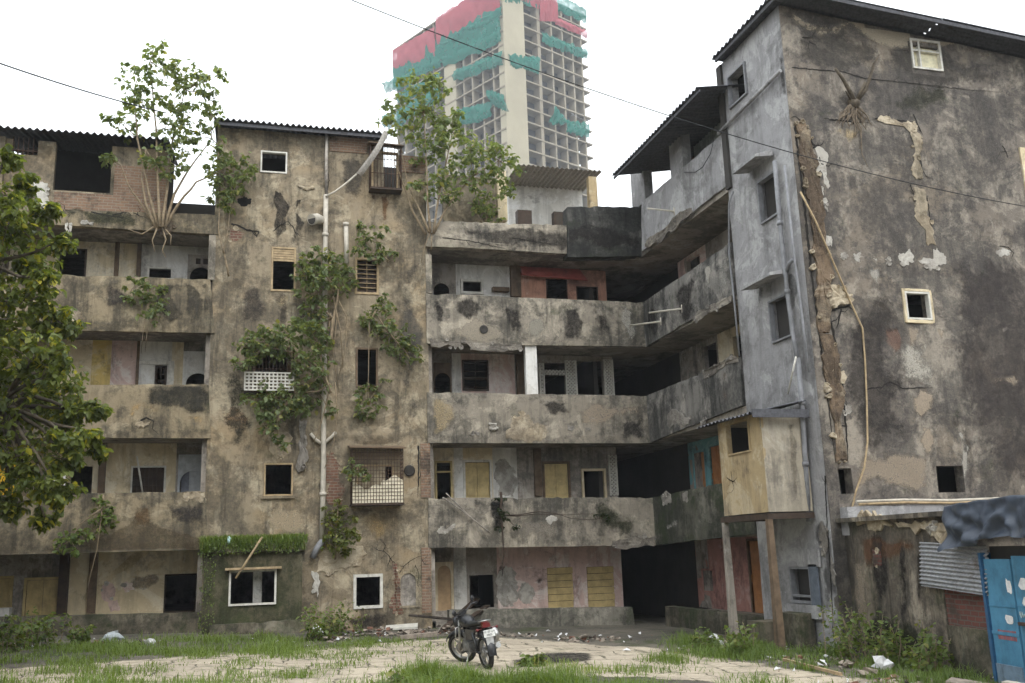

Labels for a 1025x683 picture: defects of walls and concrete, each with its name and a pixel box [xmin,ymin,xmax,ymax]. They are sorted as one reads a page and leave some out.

damp [274,191,304,238]
spalling [794,115,946,464]
damp [545,402,566,415]
damp [847,298,931,446]
flaking render [859,428,933,489]
damp [959,261,1025,476]